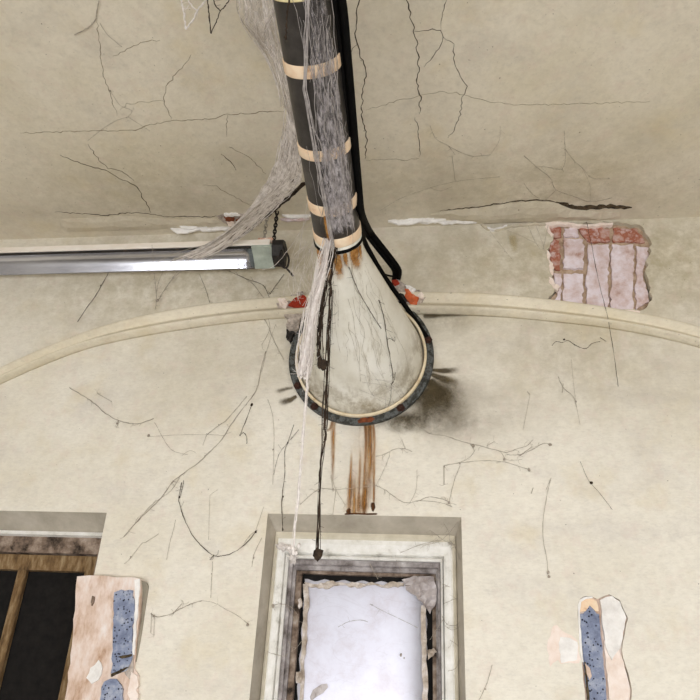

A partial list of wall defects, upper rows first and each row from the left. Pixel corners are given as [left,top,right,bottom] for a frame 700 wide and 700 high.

crack [441,199,632,211]
flaking render [388,218,650,313]
flaking render [276,291,308,344]
rust [345,417,377,515]
leakage [390,414,420,427]
leakage [417,373,453,412]
flaking render [65,575,149,700]
flaking render [547,595,631,700]